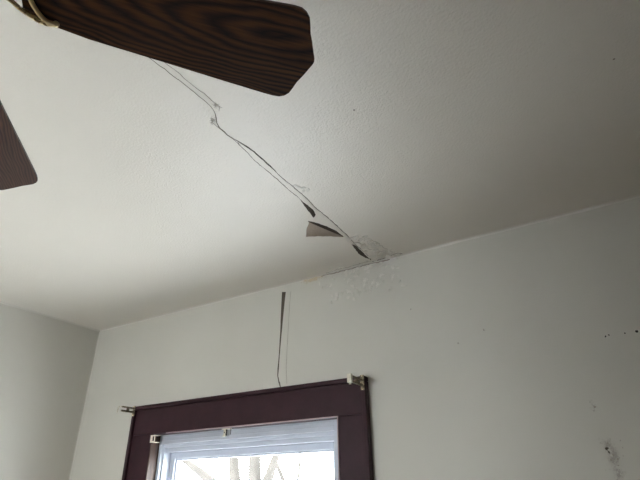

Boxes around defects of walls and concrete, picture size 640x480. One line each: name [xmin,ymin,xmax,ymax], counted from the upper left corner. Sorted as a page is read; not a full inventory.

crack [150,58,390,277]
crack [277,291,291,387]